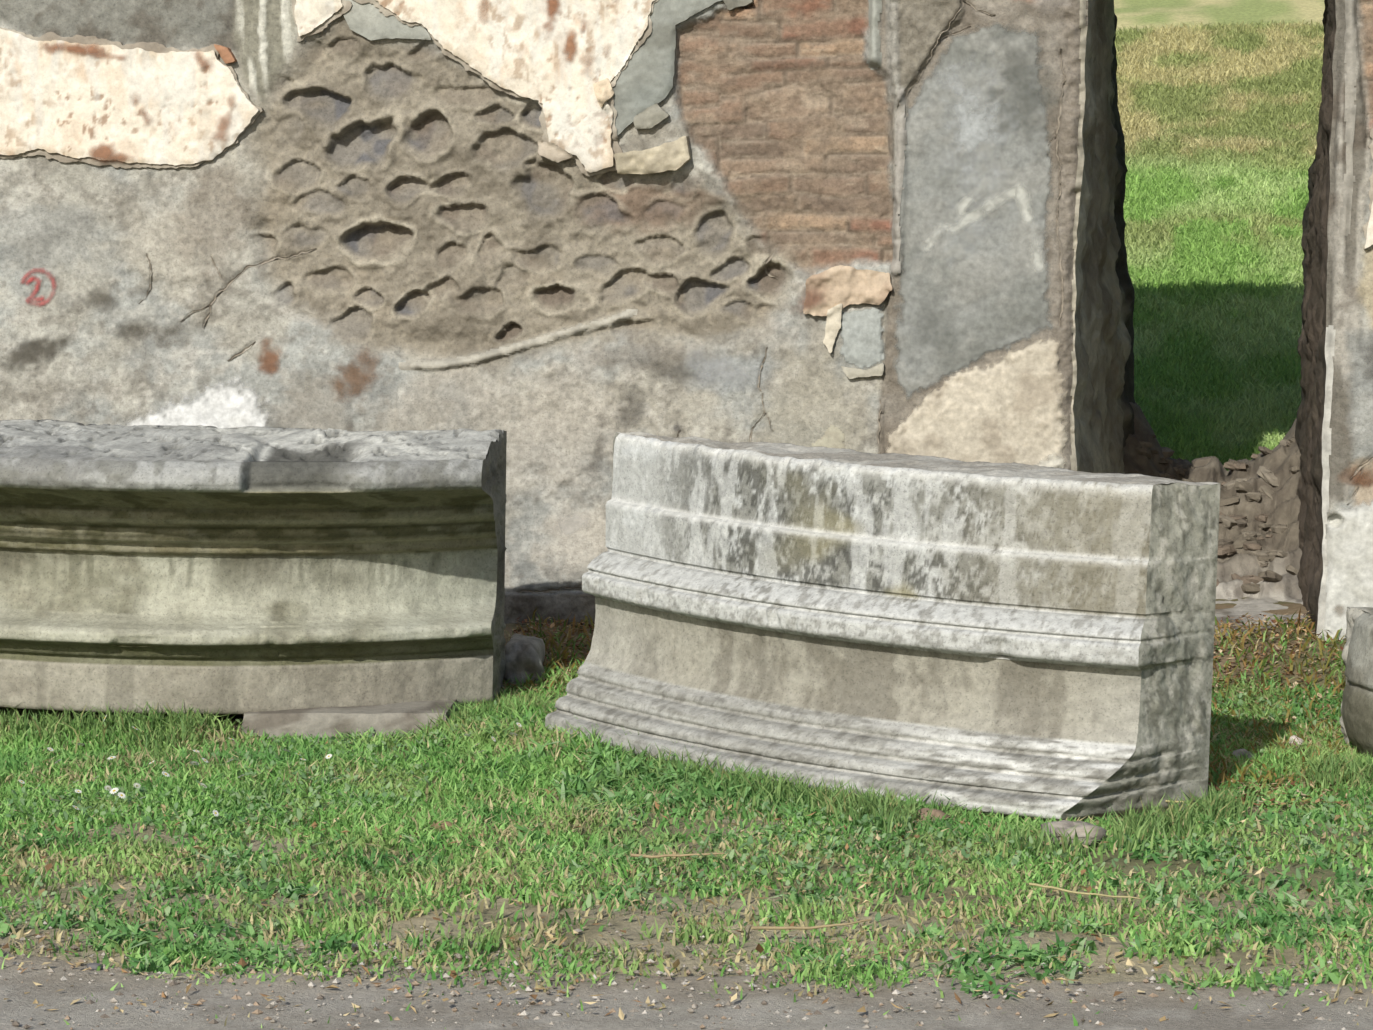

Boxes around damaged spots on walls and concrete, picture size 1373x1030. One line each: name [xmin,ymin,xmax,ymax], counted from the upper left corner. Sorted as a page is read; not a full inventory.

spalling [0,0,1068,469]
crack [181,248,316,327]
rust [260,351,278,372]
rust [337,366,369,392]
crack [749,347,773,440]